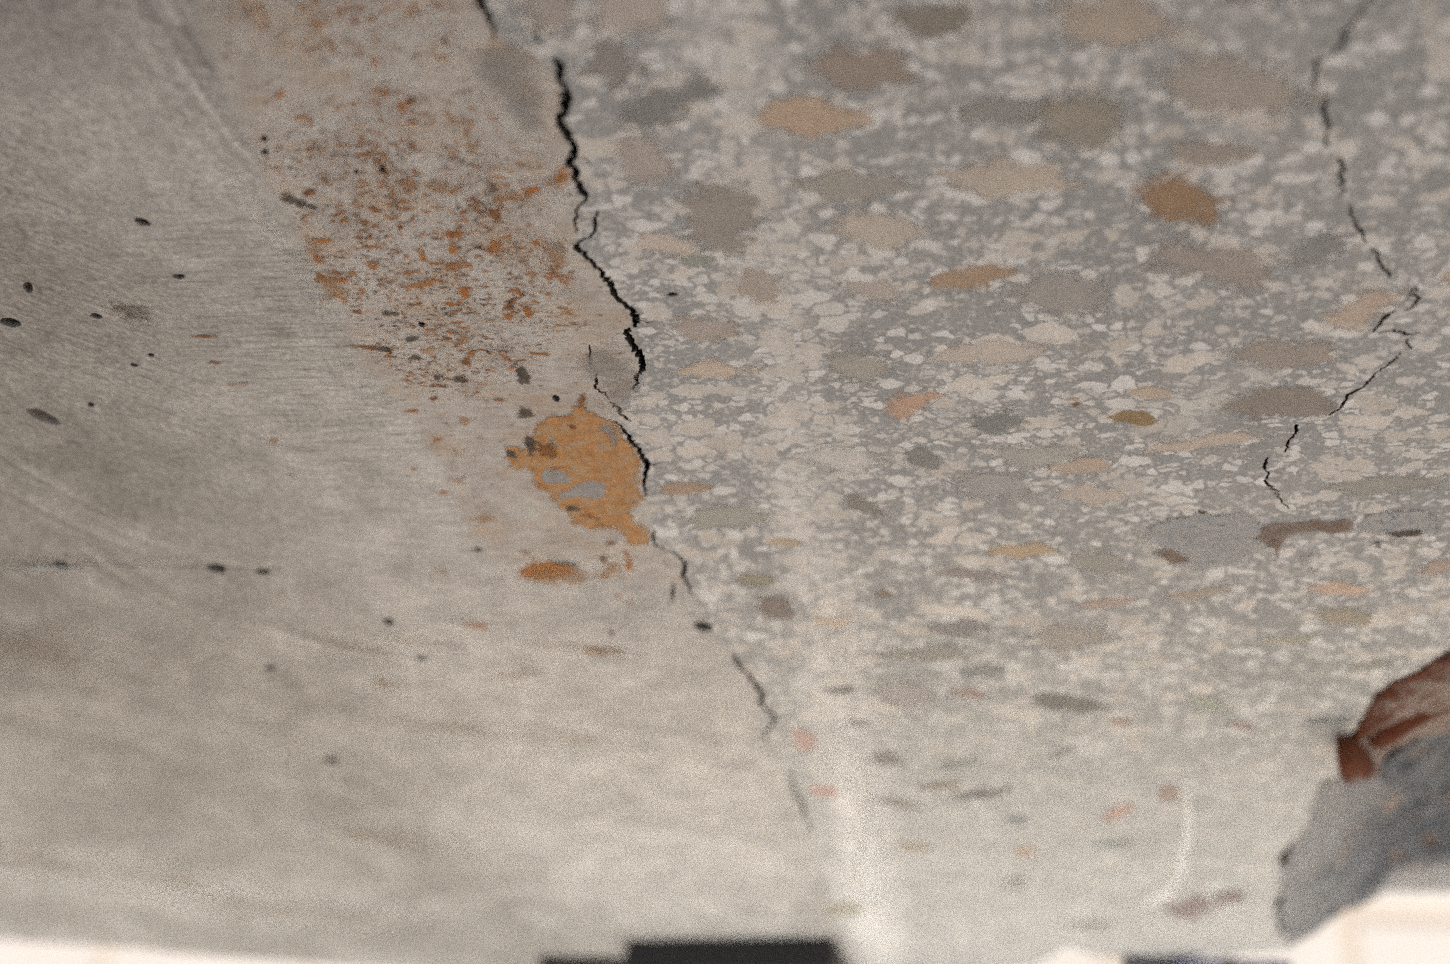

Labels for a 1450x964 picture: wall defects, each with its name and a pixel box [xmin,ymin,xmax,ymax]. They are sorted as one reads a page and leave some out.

crack [475,0,497,40]
corrosion [258,89,587,413]
crack [531,27,659,493]
crack [1262,0,1421,509]
corrosion [519,551,633,583]
crack [651,530,692,603]
crack [732,654,778,745]
corrosion [1336,651,1450,785]
spalling [1275,731,1450,947]